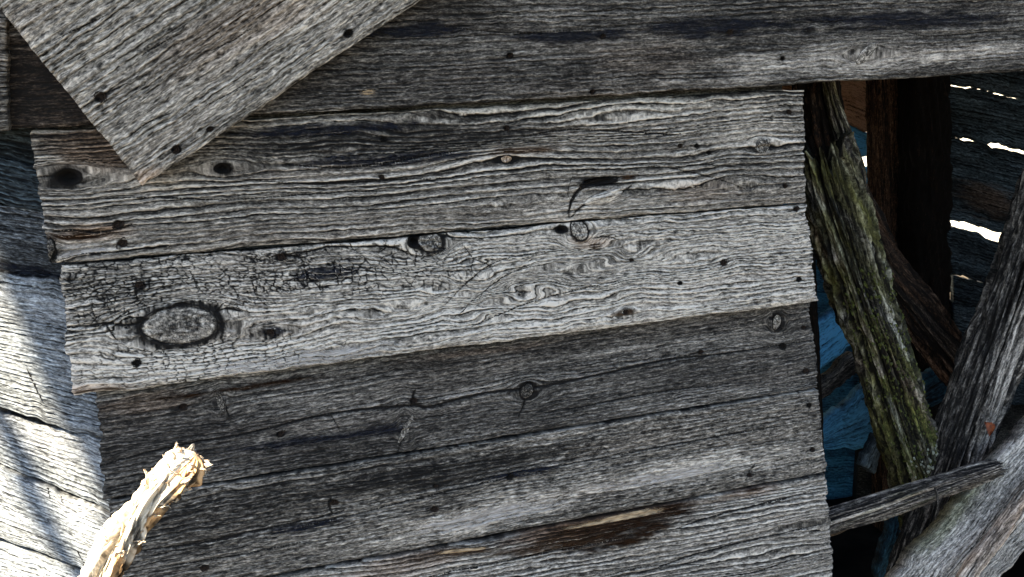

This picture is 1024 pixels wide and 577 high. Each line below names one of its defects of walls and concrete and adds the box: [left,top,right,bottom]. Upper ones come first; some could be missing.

crack [567,164,741,242]
crack [283,243,352,295]
crack [39,271,263,367]